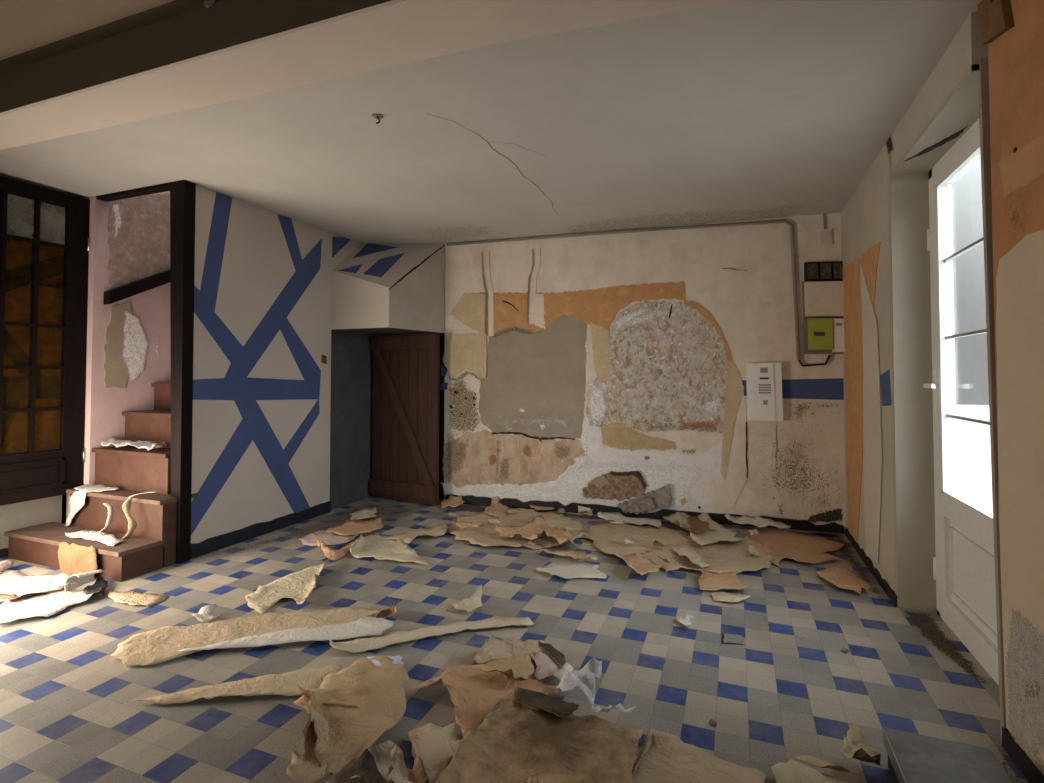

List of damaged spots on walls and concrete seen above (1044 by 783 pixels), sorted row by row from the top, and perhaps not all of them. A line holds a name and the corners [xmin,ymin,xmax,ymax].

crack [426,113,559,215]
flaking render [442,300,728,488]
flaking render [582,471,672,514]
leakage [752,396,843,524]